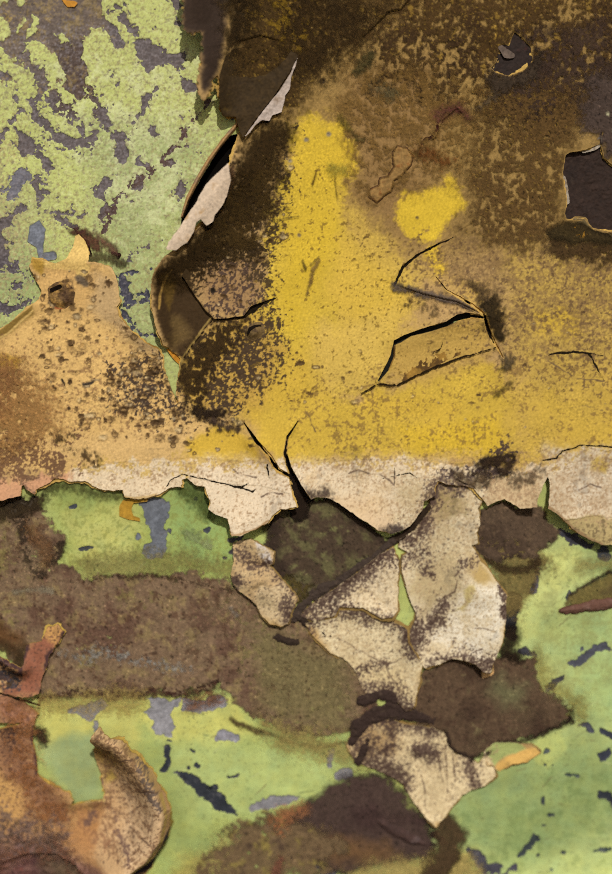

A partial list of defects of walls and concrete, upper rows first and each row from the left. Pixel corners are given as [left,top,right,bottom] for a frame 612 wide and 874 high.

peeling [0,0,131,215]
damp [218,0,612,254]
peeling [90,155,156,234]
crack [395,237,454,284]
crack [361,300,496,394]
crack [166,421,298,493]
corrosion [559,598,612,615]
peeling [567,641,612,667]
corrosion [2,703,67,822]
peeling [0,622,240,874]
peeling [327,719,553,828]
corrosion [0,837,90,874]